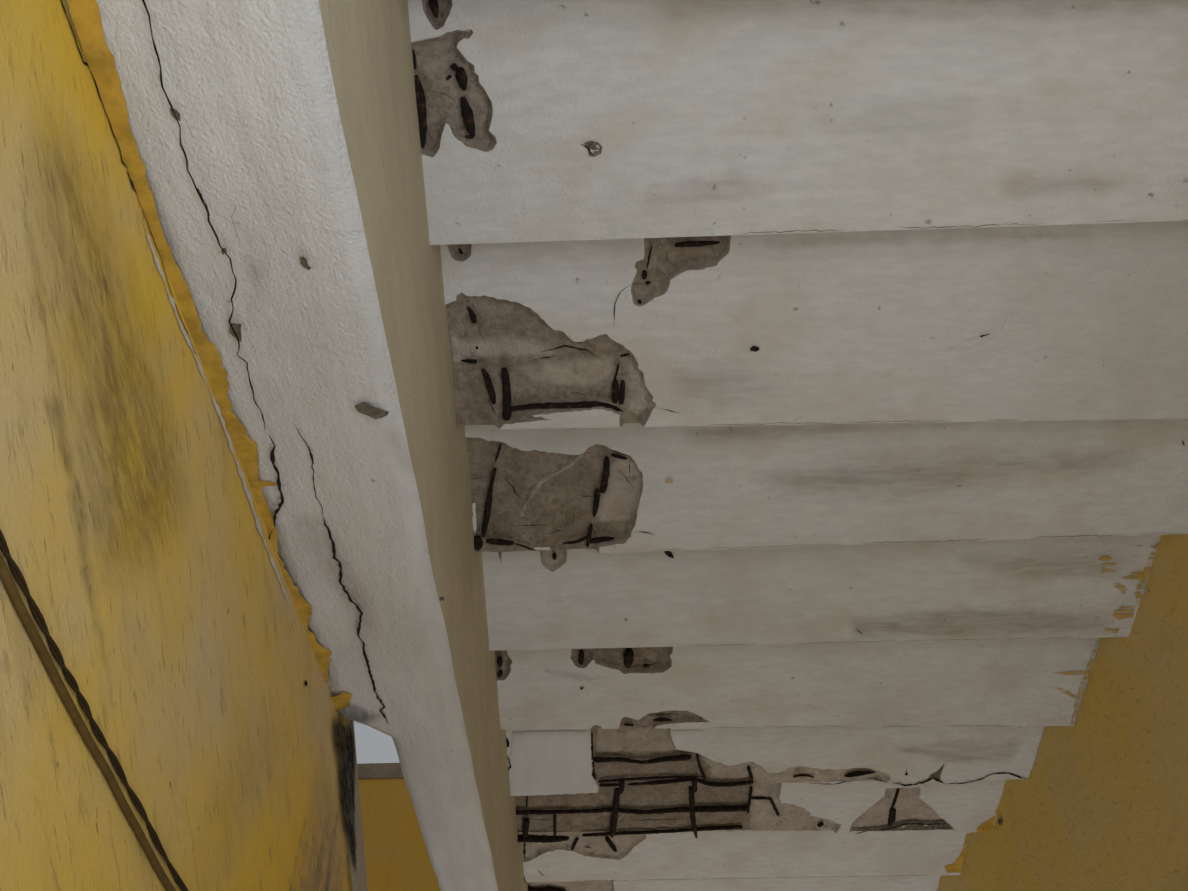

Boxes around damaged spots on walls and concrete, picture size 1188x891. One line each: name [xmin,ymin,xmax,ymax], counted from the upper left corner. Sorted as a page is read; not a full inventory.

spalling [411,0,497,157]
crack [61,0,198,363]
spalling [631,235,731,306]
crack [142,0,389,725]
spalling [446,293,656,572]
spalling [570,647,673,674]
spalling [515,710,956,862]
crack [894,773,1027,786]
spalling [528,881,614,891]